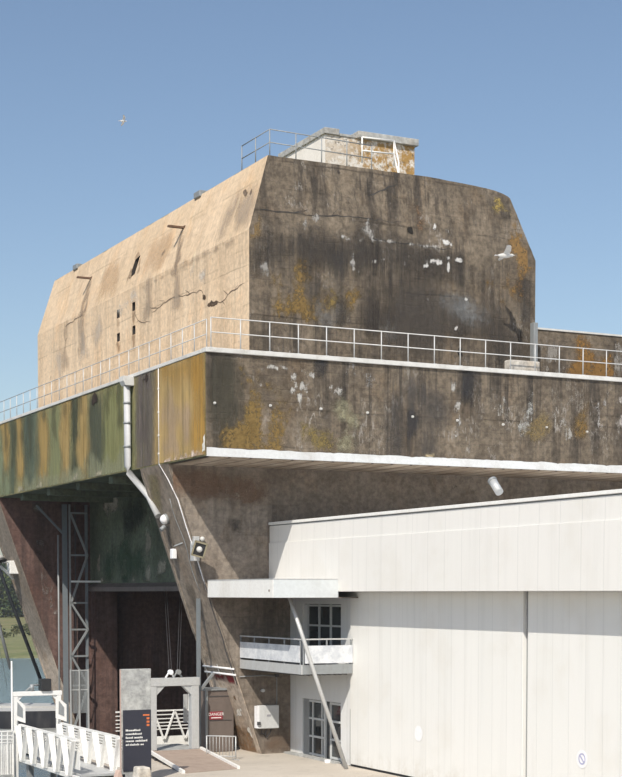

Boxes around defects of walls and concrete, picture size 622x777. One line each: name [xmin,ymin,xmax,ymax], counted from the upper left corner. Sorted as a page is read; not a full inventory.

crack [134,283,243,323]
damp [256,215,468,350]
damp [478,309,519,360]
damp [24,413,37,491]
damp [46,398,78,480]
damp [89,401,104,478]
damp [219,379,288,450]
damp [291,360,326,403]
damp [408,380,442,436]
damp [451,371,472,425]